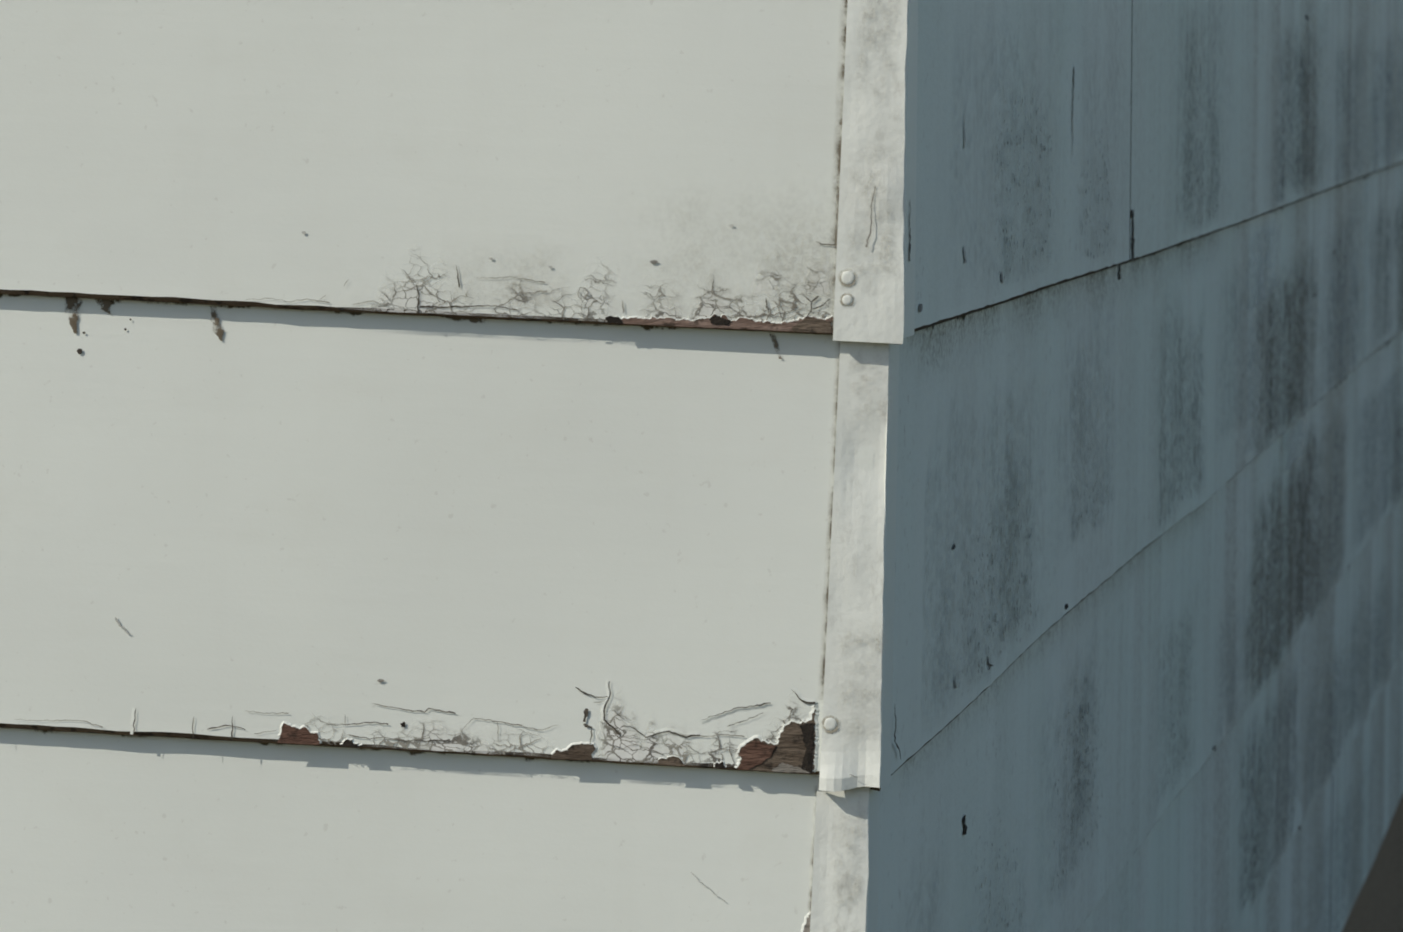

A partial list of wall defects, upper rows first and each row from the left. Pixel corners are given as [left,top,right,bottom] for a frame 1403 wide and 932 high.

peeling [605,313,834,333]
damp [1249,438,1338,692]
peeling [277,721,322,745]
peeling [340,738,370,748]
peeling [551,741,598,760]
peeling [658,754,684,766]
peeling [714,702,819,773]
peeling [801,911,811,932]